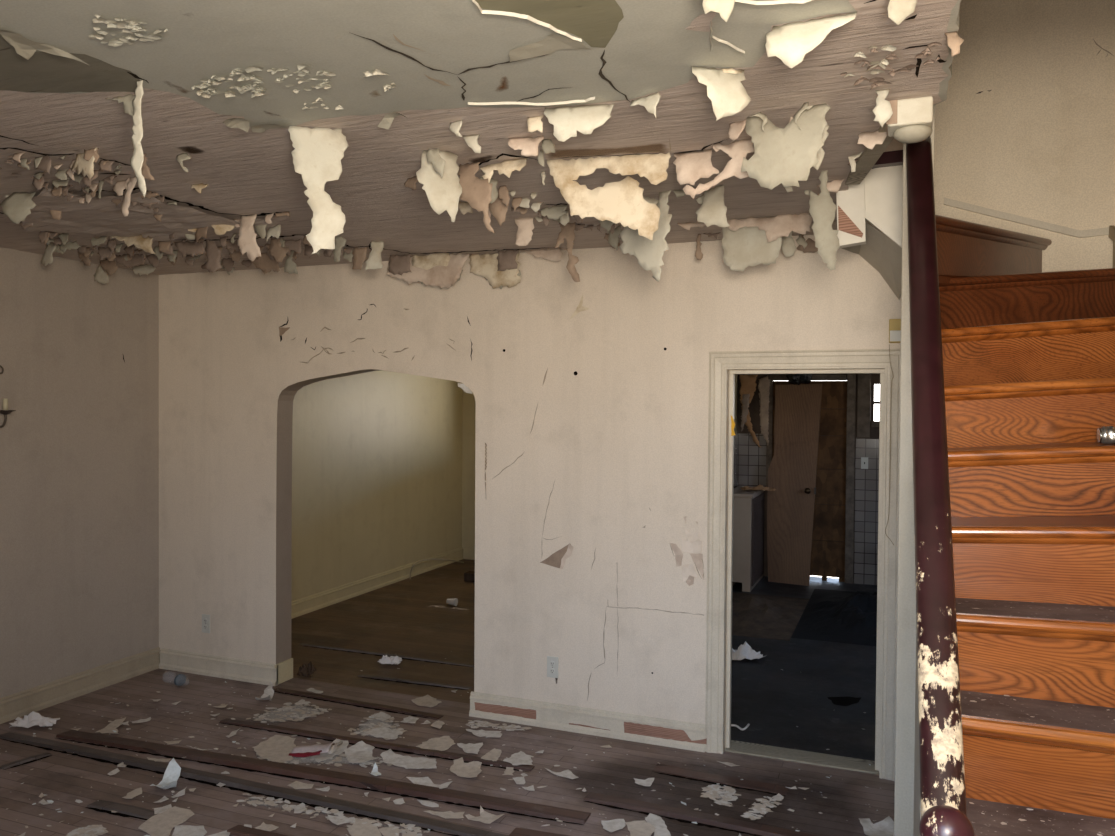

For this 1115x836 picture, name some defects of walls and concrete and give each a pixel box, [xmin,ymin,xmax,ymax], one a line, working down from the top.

crack [351,33,548,100]
crack [599,50,630,102]
crack [0,135,72,156]
flaking render [0,0,964,320]
crack [89,158,307,256]
crack [346,245,563,254]
peeling [540,544,573,569]
peeling [669,516,704,586]
crack [587,548,703,700]
peeling [474,702,536,719]
peeling [569,722,707,744]